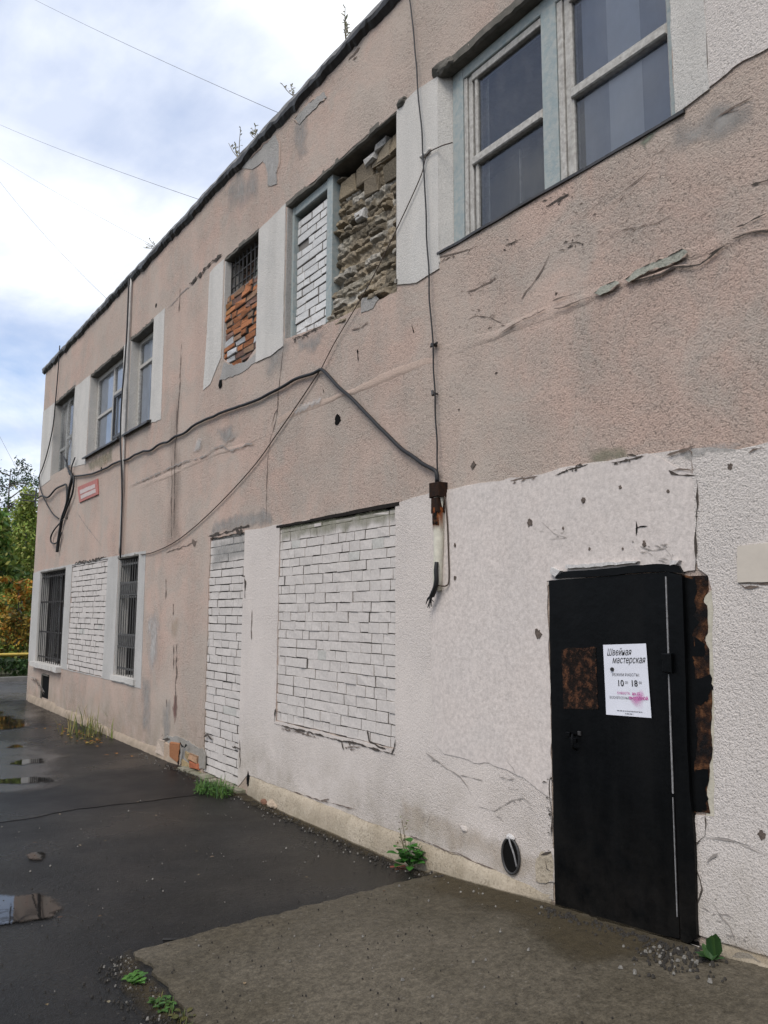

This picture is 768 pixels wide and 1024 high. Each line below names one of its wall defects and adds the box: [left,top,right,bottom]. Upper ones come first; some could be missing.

peeling [293,91,327,124]
peeling [242,134,281,186]
spalling [327,160,397,325]
crack [501,256,592,333]
peeling [593,248,688,296]
crack [626,213,768,284]
rust [680,574,710,679]
spalling [155,735,206,773]
crack [274,709,395,755]
crack [426,753,515,797]
rust [694,690,713,813]
crack [409,835,495,870]